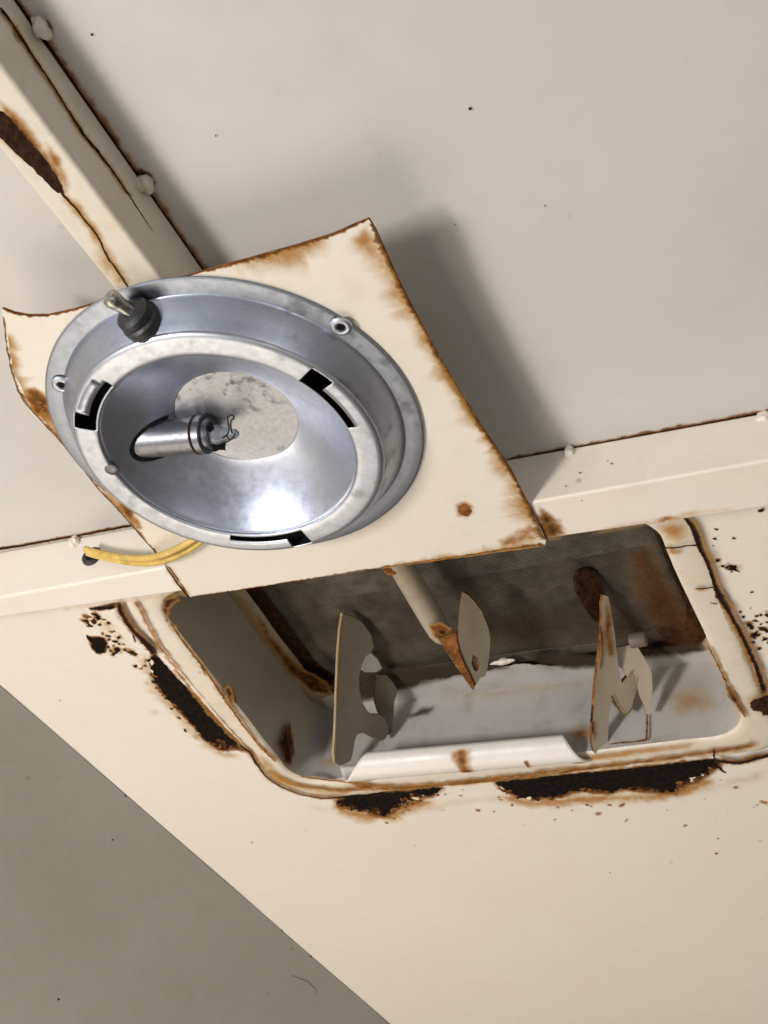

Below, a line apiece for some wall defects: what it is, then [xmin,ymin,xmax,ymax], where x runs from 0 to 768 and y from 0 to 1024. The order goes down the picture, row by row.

corrosion [4,107,62,183]
corrosion [3,305,90,449]
corrosion [43,20,768,823]
corrosion [0,473,157,553]